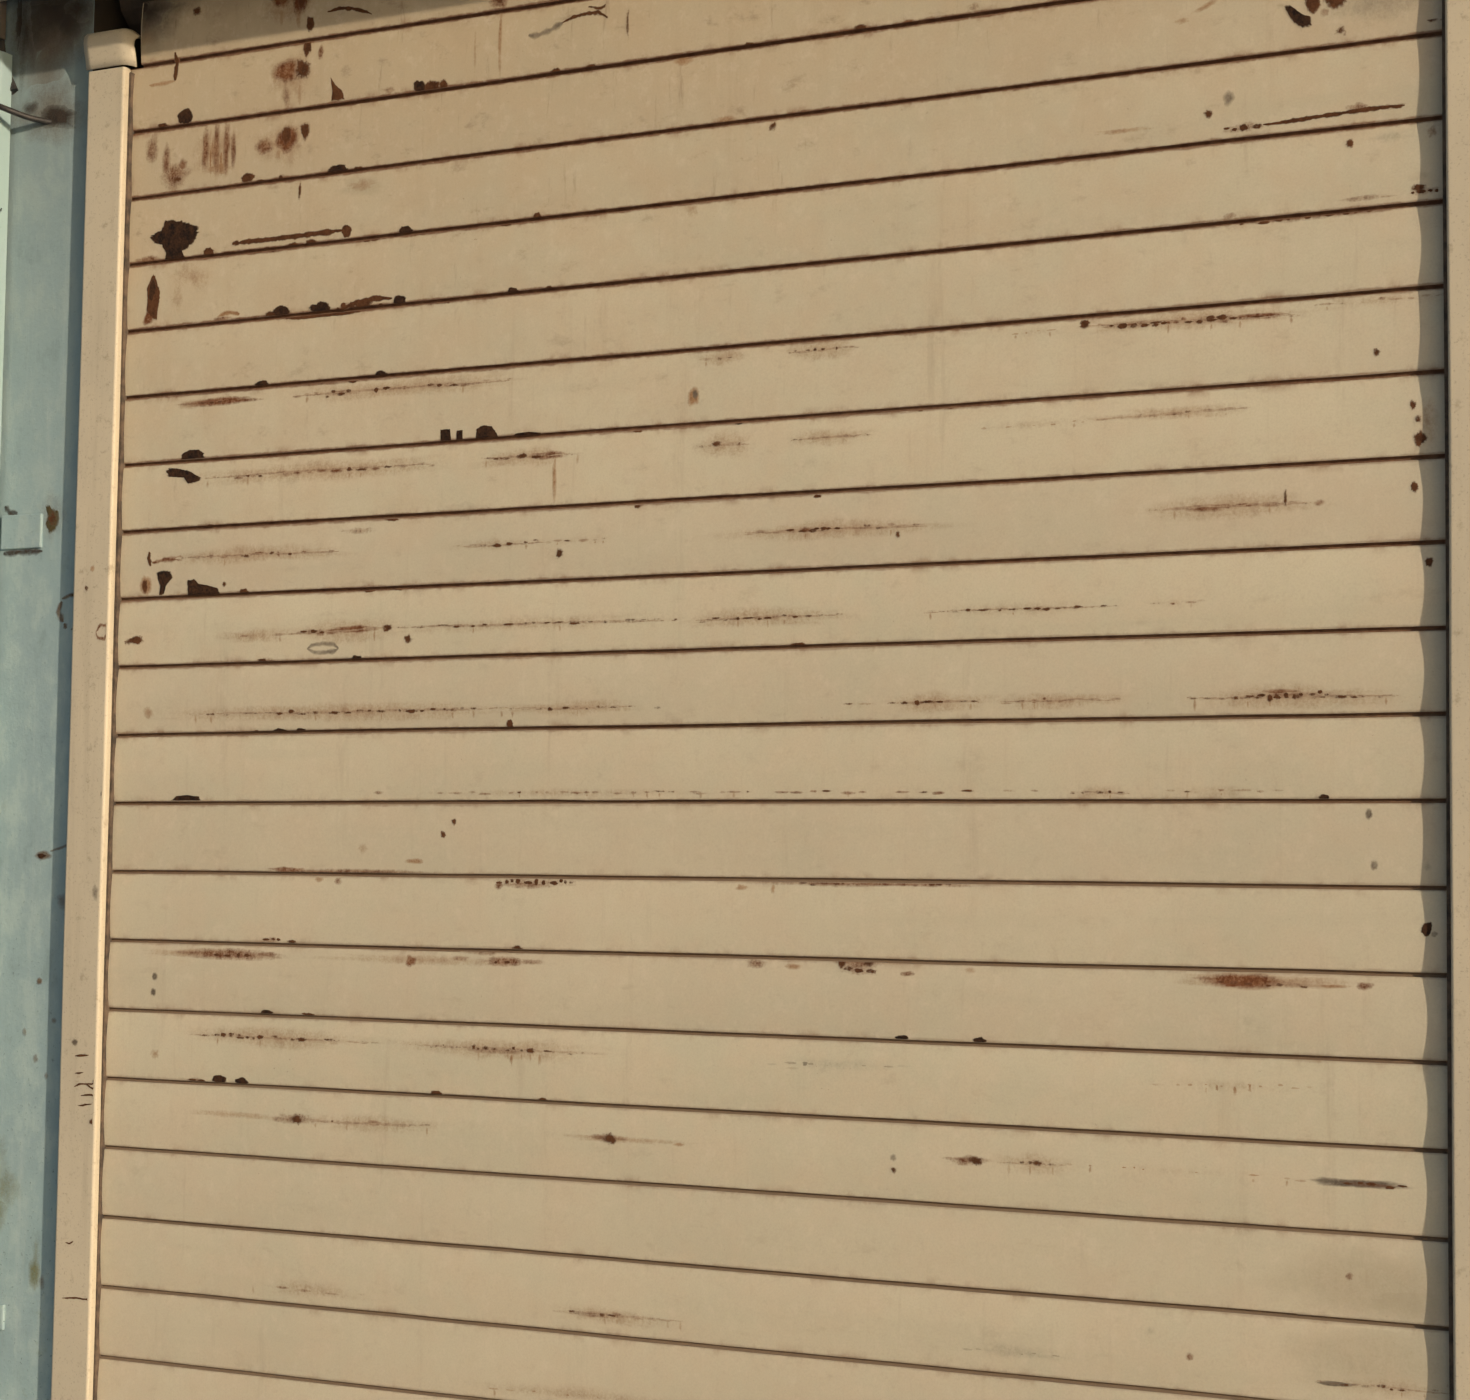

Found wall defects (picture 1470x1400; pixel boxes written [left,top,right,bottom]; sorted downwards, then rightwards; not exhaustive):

corrosion [1282,0,1348,30]
corrosion [144,0,325,191]
corrosion [1202,89,1440,150]
corrosion [232,294,407,321]
corrosion [1000,289,1444,343]
corrosion [687,338,866,408]
corrosion [1102,483,1366,526]
corrosion [837,686,1149,718]
corrosion [1167,679,1435,714]
corrosion [1155,972,1376,992]
corrosion [540,1130,718,1147]